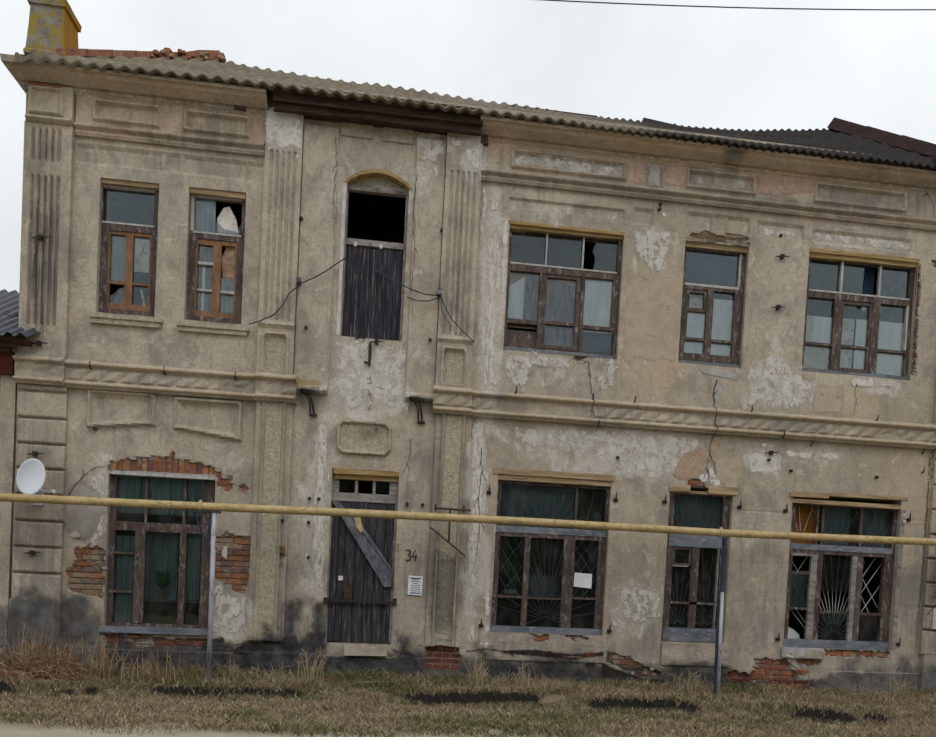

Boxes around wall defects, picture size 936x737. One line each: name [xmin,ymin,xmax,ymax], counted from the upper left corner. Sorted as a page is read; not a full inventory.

peeling [251,106,302,159]
flaking render [598,227,679,389]
peeling [319,338,407,410]
peeling [748,352,818,408]
peeling [515,426,841,488]
crack [706,379,718,482]
spalling [66,452,248,598]
spalling [101,532,268,670]
damp [9,588,421,680]
spalling [504,634,663,683]
peeling [612,582,661,626]
spalling [725,650,889,690]